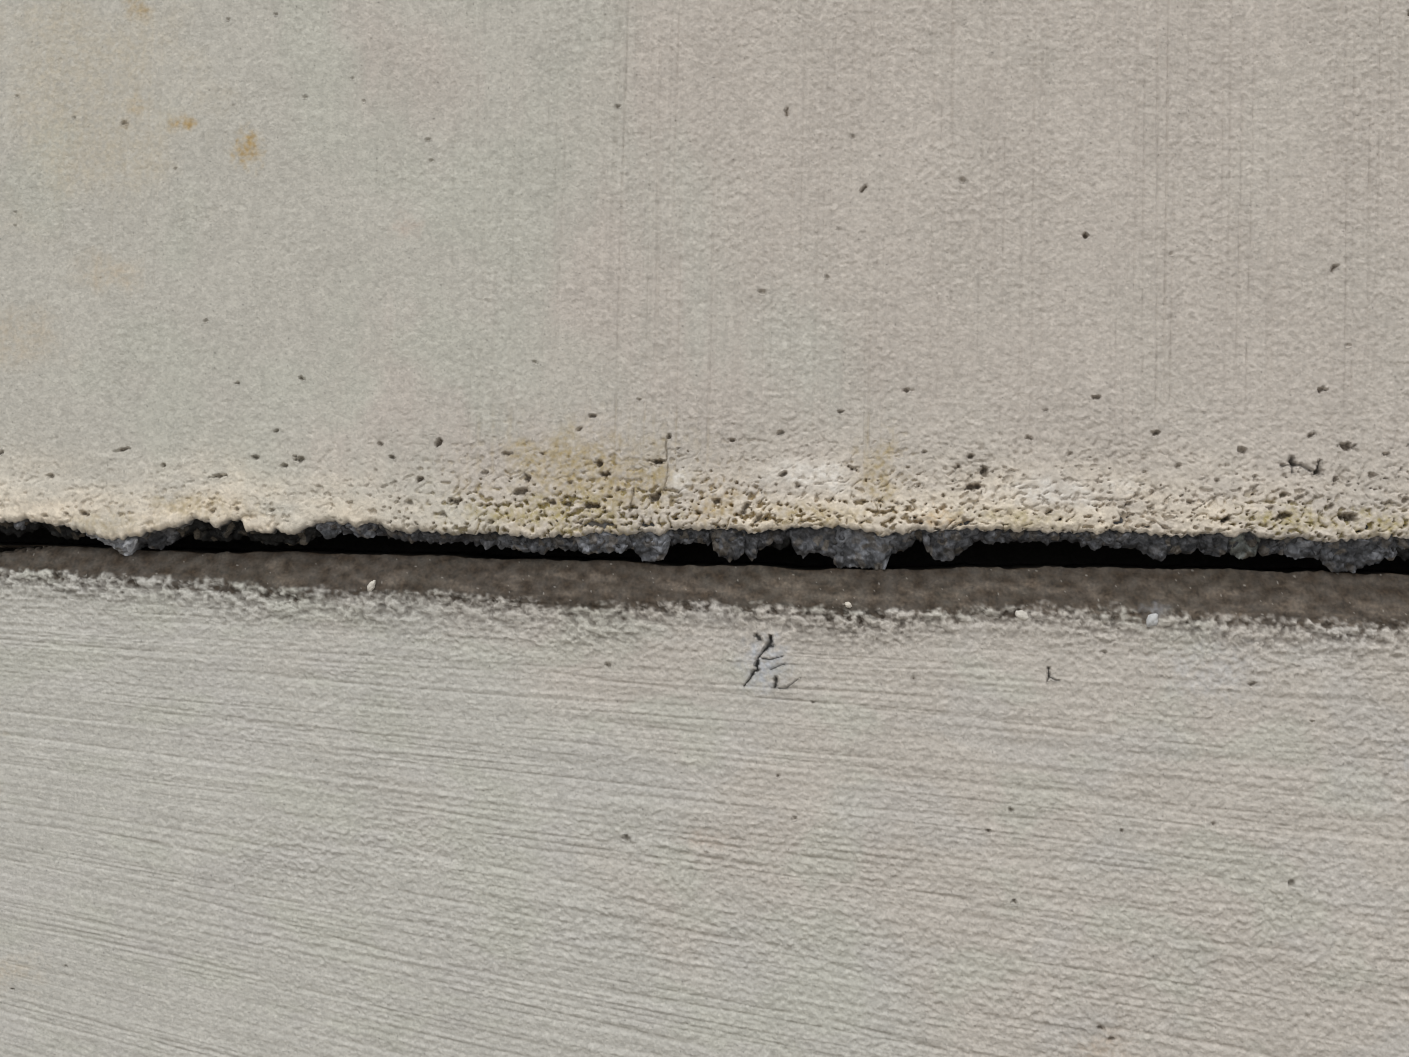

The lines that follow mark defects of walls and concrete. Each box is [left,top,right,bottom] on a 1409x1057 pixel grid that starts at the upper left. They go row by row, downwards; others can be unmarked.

spalling [280,455,305,469]
spalling [594,458,620,493]
spalling [952,453,991,492]
spalling [1278,455,1340,483]
spalling [1337,441,1358,452]
spalling [0,473,1409,573]
crack [743,631,801,692]